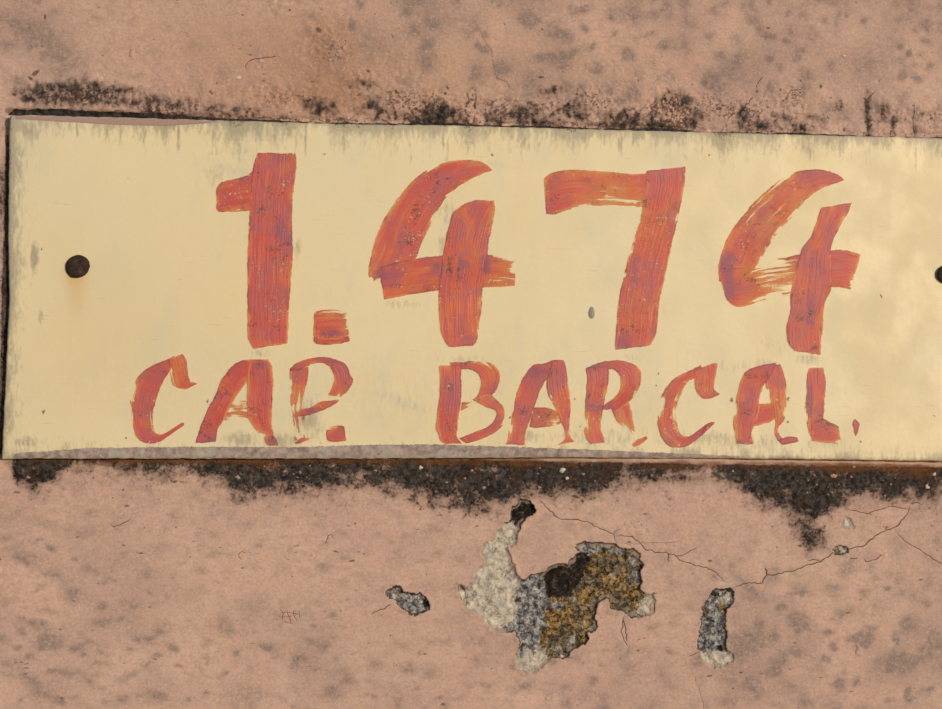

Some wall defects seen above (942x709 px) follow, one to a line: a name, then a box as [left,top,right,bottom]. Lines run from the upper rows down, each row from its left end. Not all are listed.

mould [8,80,703,132]
mould [712,91,942,138]
water stain [0,135,9,454]
spalling [386,585,430,617]
water stain [11,458,942,551]
peeling [458,498,656,674]
spalling [697,587,734,669]
crack [542,502,942,588]